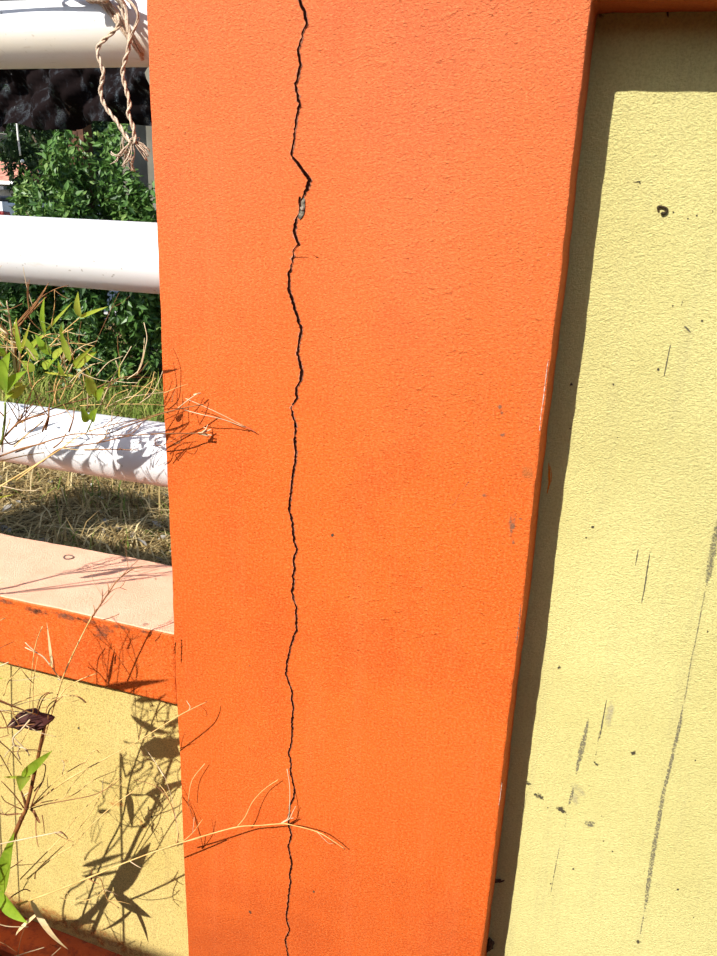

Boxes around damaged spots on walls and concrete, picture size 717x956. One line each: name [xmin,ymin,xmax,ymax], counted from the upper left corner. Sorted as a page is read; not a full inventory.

crack [284,0,319,956]